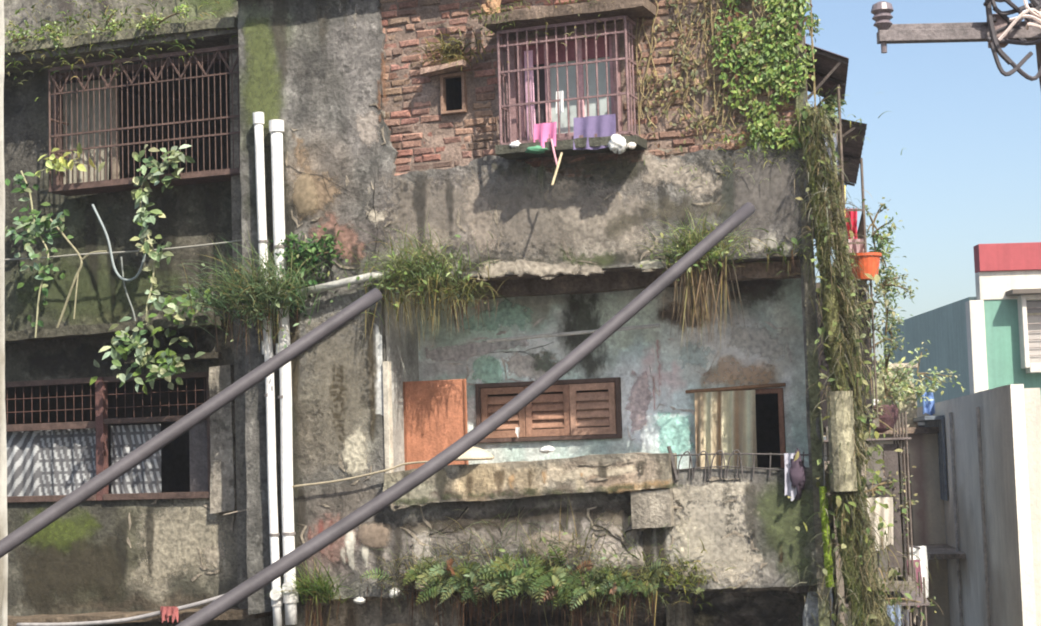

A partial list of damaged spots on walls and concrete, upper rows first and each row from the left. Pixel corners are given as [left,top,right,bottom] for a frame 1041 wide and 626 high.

flaking render [355,0,808,206]
flaking render [367,210,400,227]
flaking render [424,179,668,280]
flaking render [748,230,800,256]
leakage [563,296,600,350]
leakage [532,351,558,372]
leakage [579,346,602,377]
leakage [18,520,127,605]